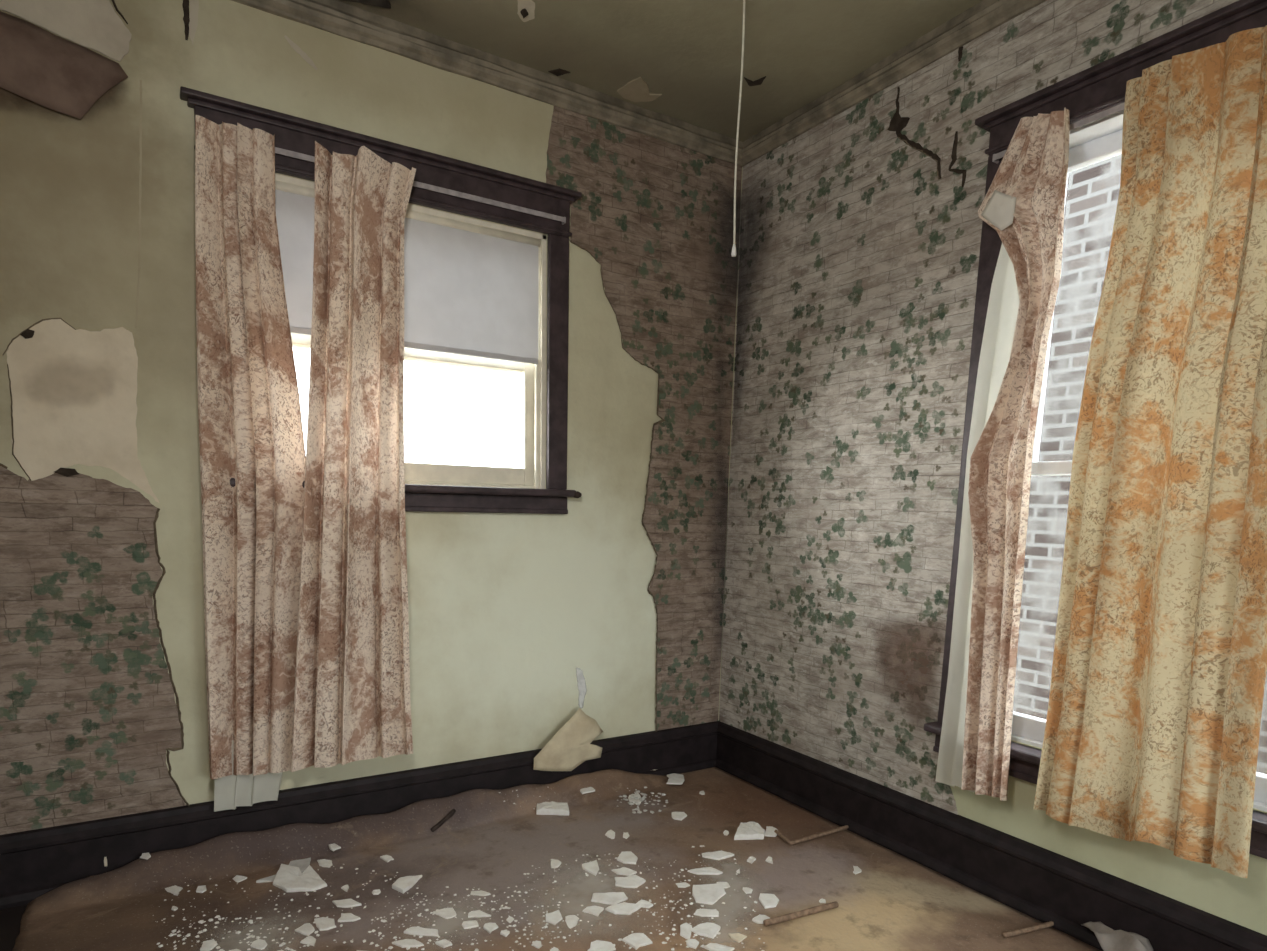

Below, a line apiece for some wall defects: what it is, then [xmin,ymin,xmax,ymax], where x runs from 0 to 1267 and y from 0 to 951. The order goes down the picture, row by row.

spalling [0,0,132,62]
spalling [517,0,535,22]
crack [956,46,964,61]
crack [887,87,966,187]
spalling [3,318,159,503]